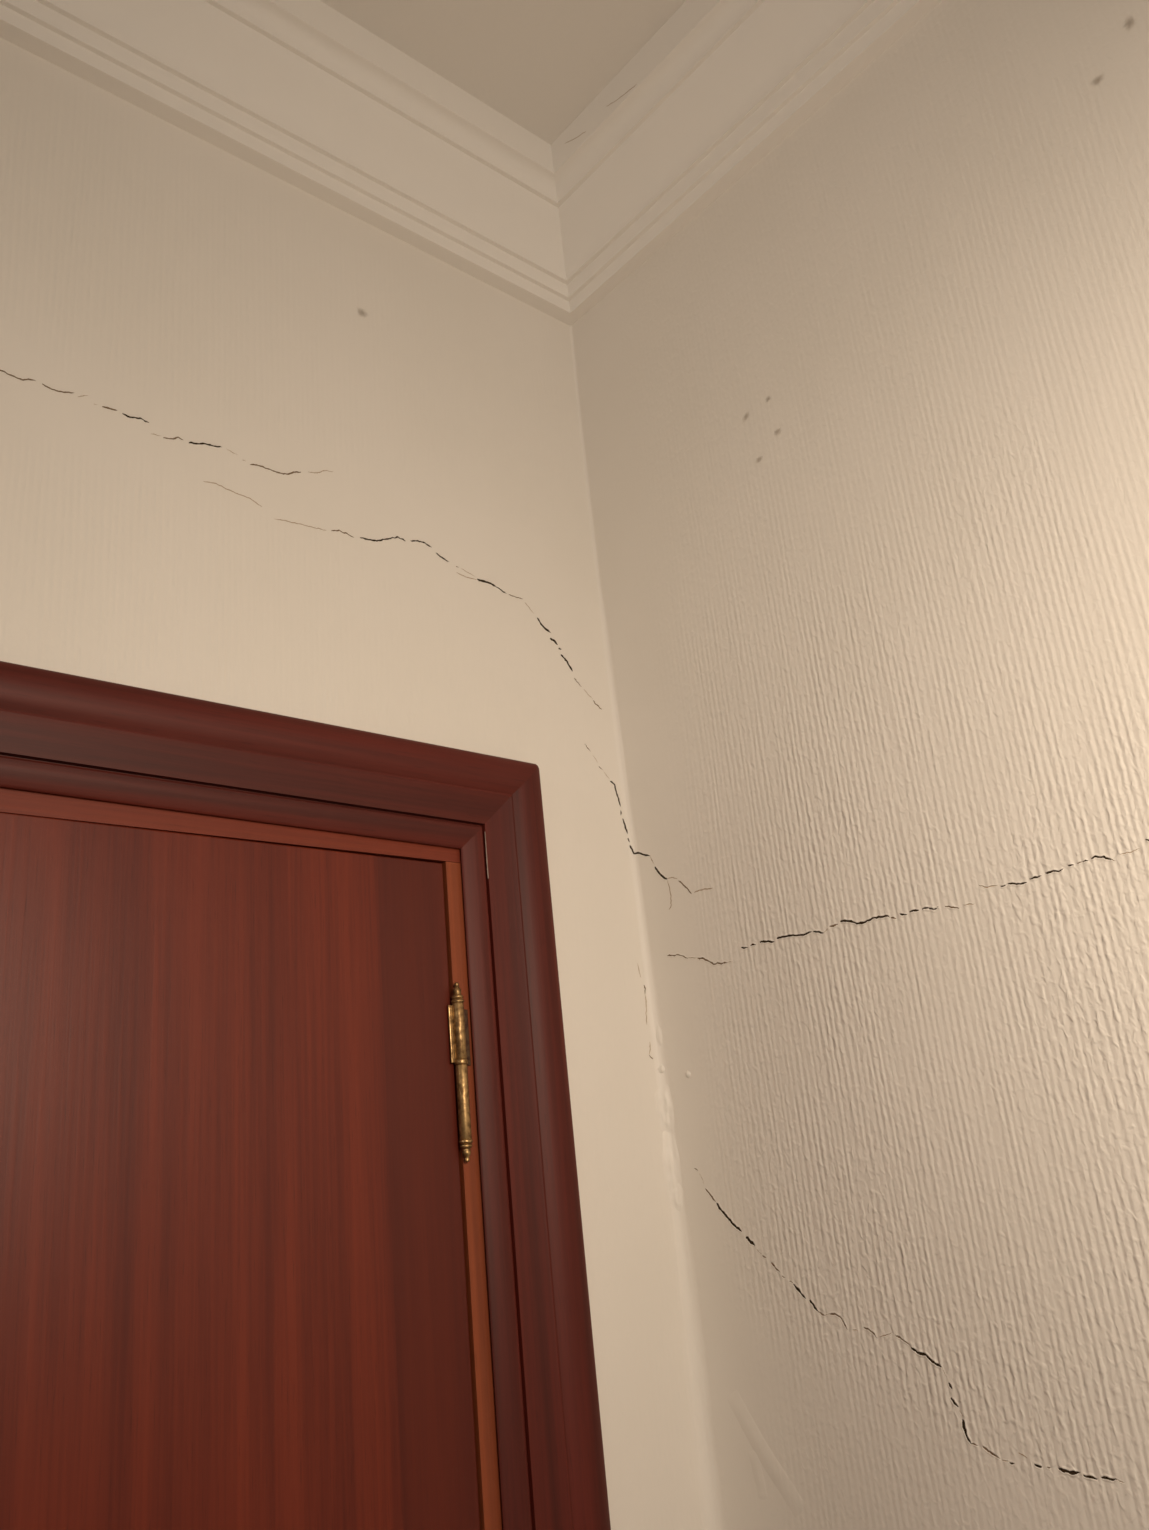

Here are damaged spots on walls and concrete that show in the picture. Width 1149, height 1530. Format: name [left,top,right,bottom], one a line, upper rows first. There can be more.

crack [0,368,602,710]
crack [584,743,712,909]
crack [637,837,1149,1060]
crack [694,1167,1125,1485]